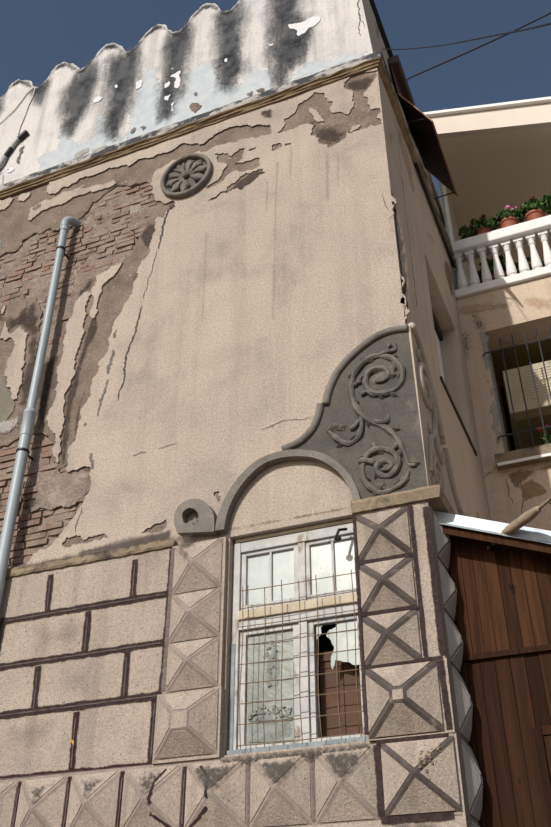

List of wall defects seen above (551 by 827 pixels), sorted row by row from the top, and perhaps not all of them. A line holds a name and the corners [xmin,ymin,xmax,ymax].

water stain [33,81,49,104]
water stain [61,63,98,135]
water stain [104,47,141,137]
water stain [163,25,193,115]
water stain [216,5,243,87]
peeling [288,16,321,36]
peeling [286,50,367,83]
crack [357,0,365,36]
crack [83,202,174,426]
spalling [0,59,382,569]
crack [483,466,526,527]
spalling [522,479,546,501]